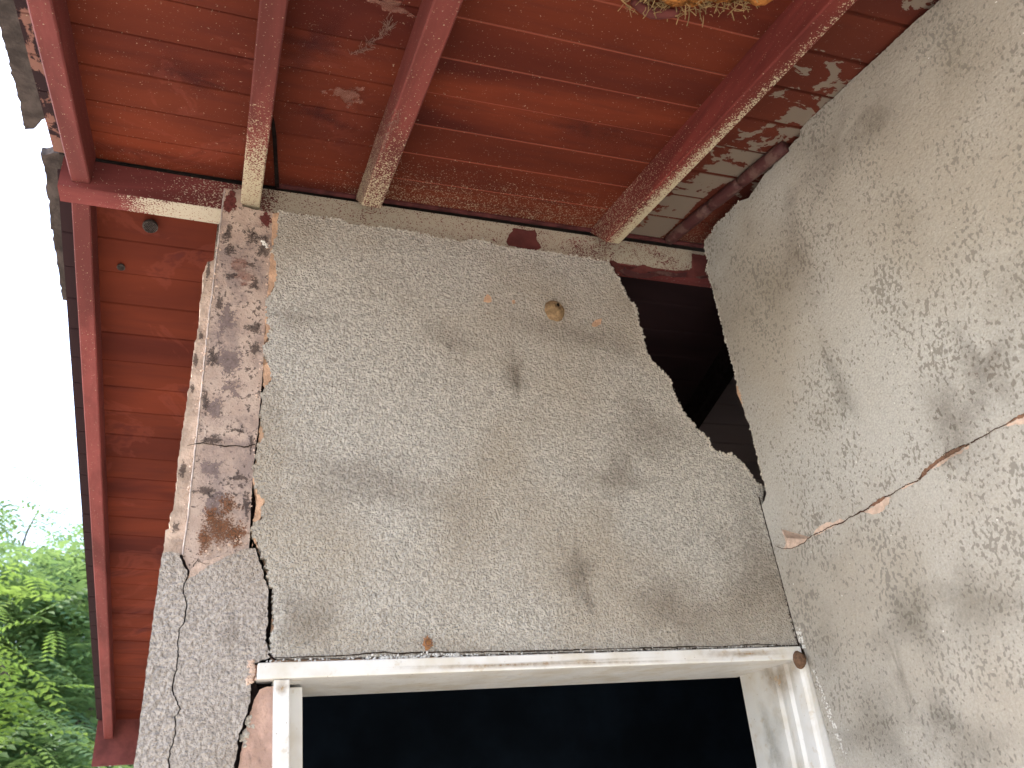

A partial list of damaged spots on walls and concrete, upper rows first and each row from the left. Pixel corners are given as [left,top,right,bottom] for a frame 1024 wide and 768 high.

peeling [223,188,237,214]
peeling [259,200,766,490]
crack [168,554,198,768]
spalling [187,529,248,580]
rust [196,493,249,558]
crack [187,212,1024,768]